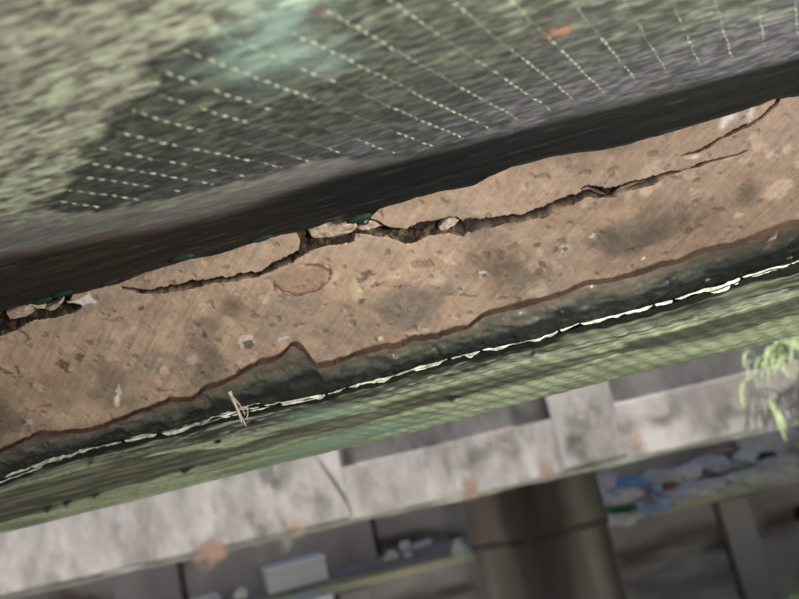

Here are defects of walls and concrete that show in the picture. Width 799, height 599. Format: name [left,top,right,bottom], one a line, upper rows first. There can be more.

rust [547,25,571,38]
crack [452,99,780,234]
crack [122,251,304,294]